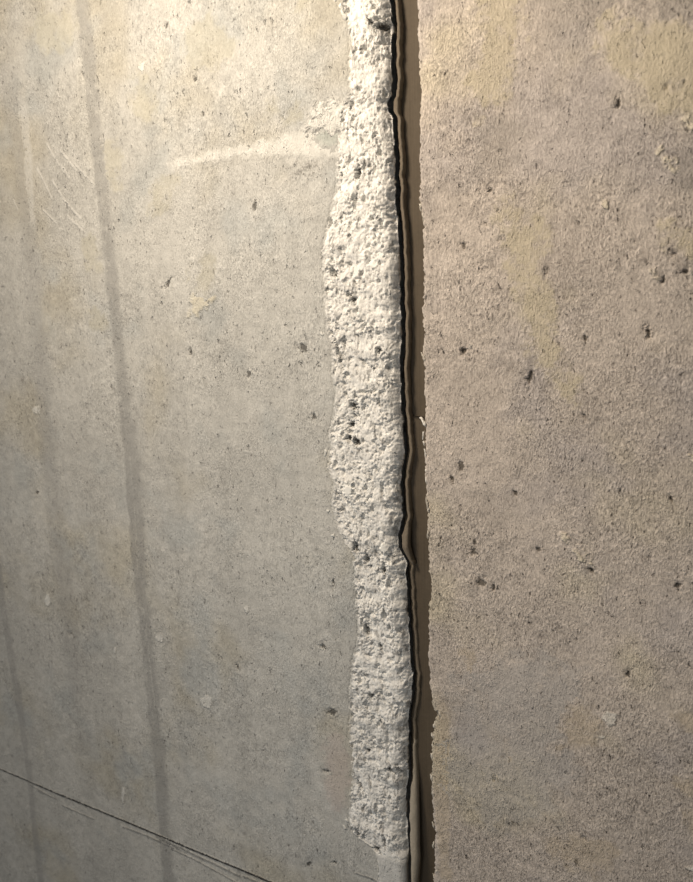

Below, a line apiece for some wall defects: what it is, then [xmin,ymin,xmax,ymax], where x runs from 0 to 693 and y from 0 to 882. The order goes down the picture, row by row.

water stain [73,0,178,882]
spalling [283,0,415,862]